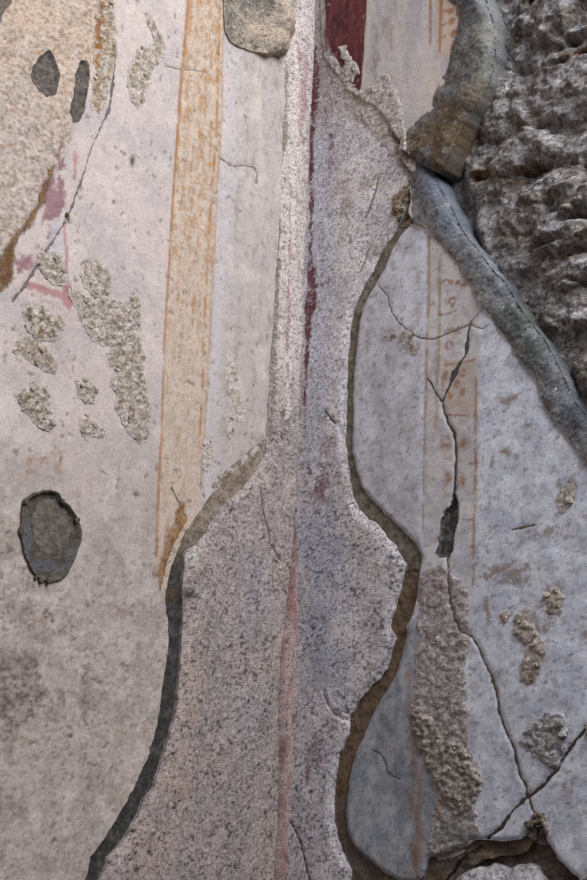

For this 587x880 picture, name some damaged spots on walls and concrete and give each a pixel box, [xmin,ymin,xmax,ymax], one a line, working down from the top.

peeling [31,50,60,97]
spalling [126,11,166,109]
spalling [324,45,417,227]
crack [366,176,379,218]
spalling [12,303,65,432]
spalling [36,251,152,444]
crack [359,250,489,491]
crack [372,748,400,779]
spalling [410,565,484,860]
crack [444,557,586,880]
spalling [499,611,546,685]
spalling [519,712,568,773]